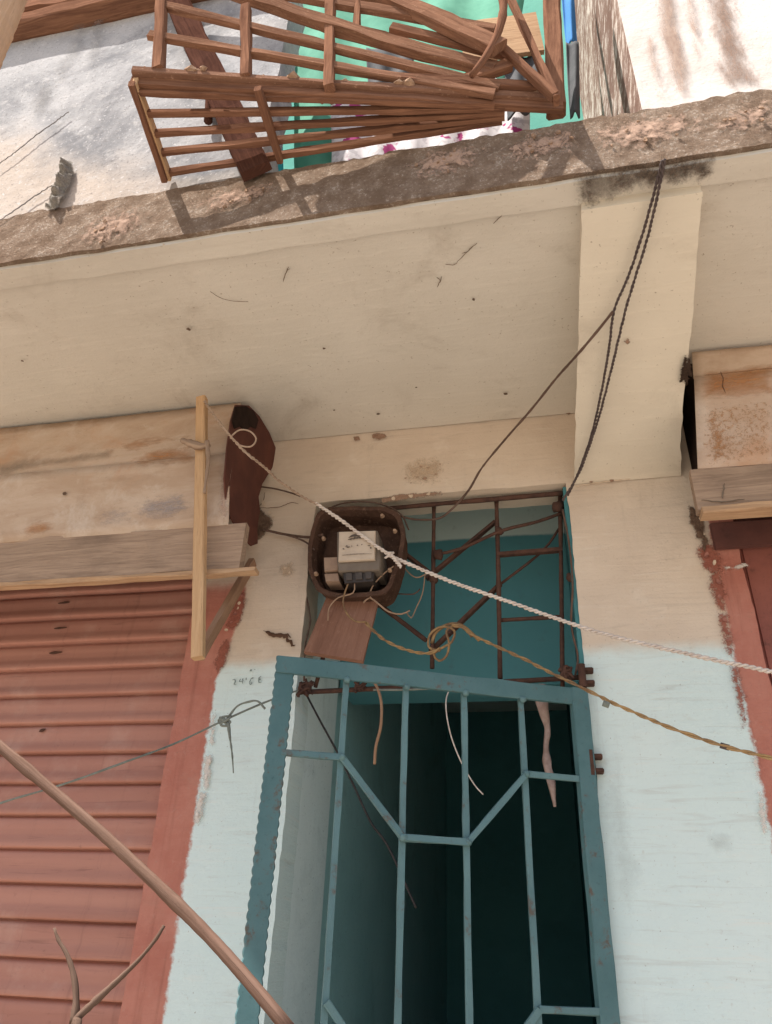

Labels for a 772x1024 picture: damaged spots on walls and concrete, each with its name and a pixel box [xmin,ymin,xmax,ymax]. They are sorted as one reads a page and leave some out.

spalling [597,113,700,148]
spalling [720,102,772,130]
damp [580,154,715,206]
spalling [82,209,139,244]
crack [265,631,295,647]